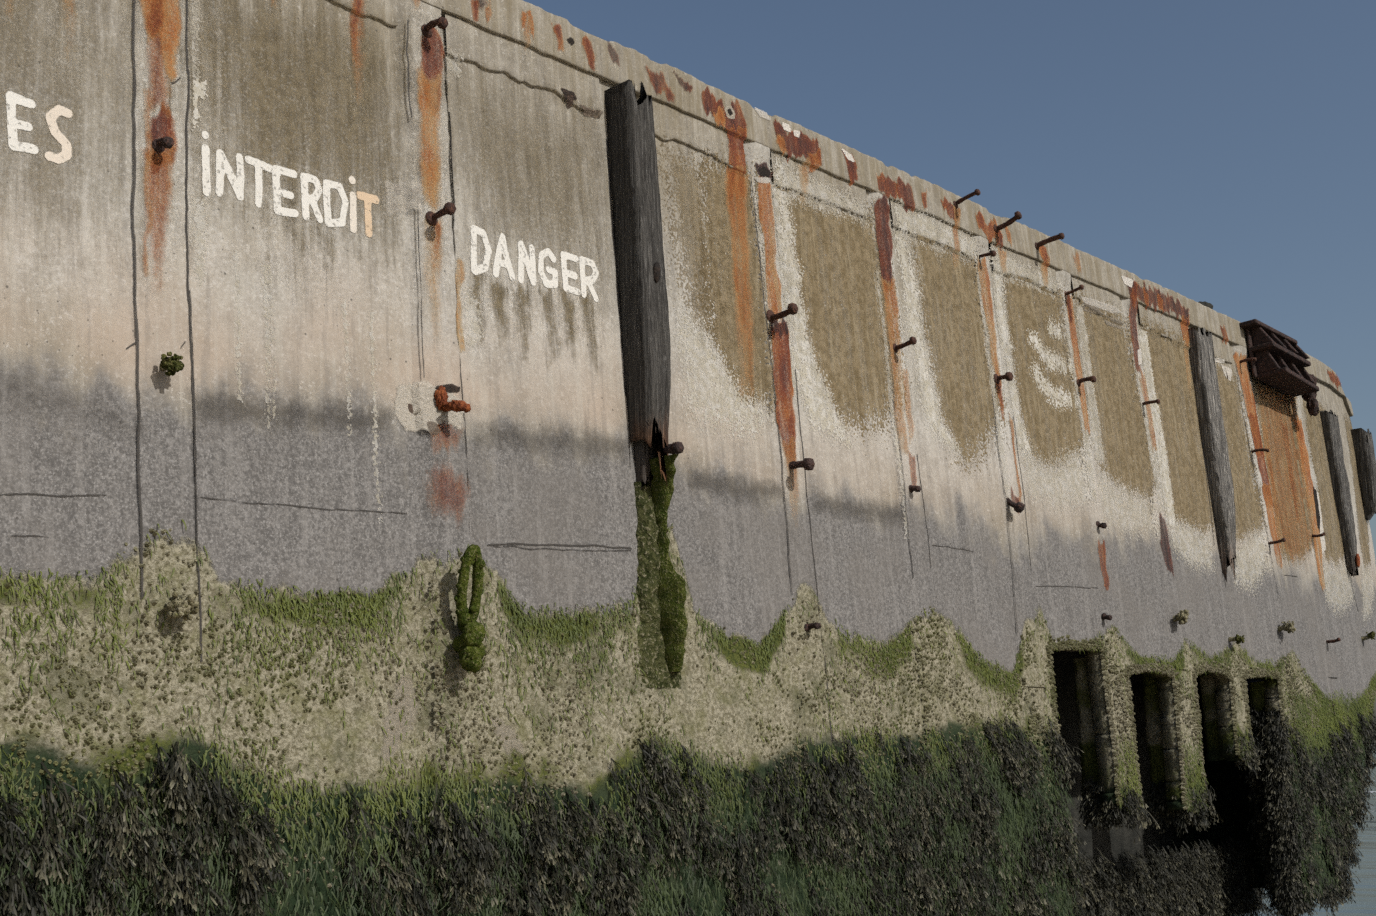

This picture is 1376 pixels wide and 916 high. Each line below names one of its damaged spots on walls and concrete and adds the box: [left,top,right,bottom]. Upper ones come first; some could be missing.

corrosion [141,0,181,248]
corrosion [351,0,362,50]
corrosion [418,28,444,205]
corrosion [647,69,796,463]
corrosion [774,119,822,172]
water stain [656,136,1216,576]
corrosion [875,172,1022,503]
corrosion [1128,278,1190,450]
corrosion [1221,326,1282,567]
corrosion [1294,415,1325,590]